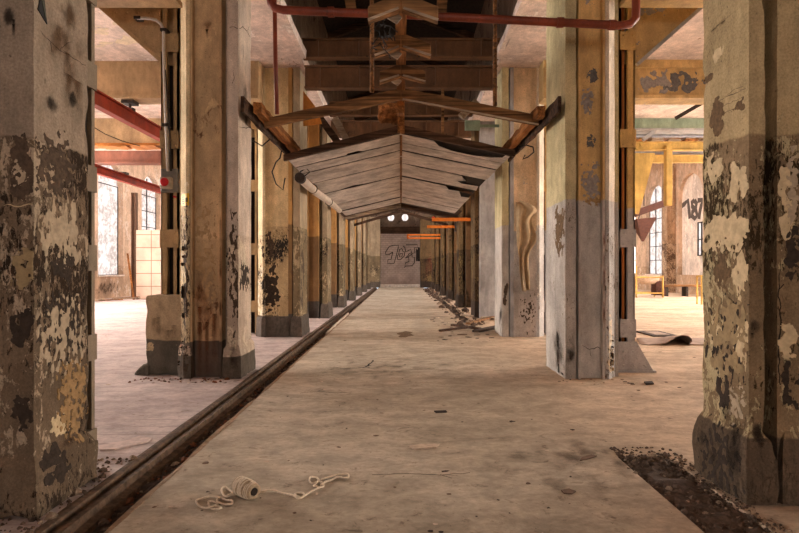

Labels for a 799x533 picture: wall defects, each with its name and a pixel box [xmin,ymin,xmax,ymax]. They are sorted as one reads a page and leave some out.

peeling [581,68,599,115]
peeling [640,45,724,94]
flaking render [709,96,745,137]
peeling [9,130,89,486]
peeling [228,210,251,338]
peeling [261,230,281,314]
peeling [519,293,535,335]
flaking render [554,205,565,257]
peeling [581,161,601,207]
peeling [697,151,750,502]
peeling [777,145,799,281]
peeling [777,323,799,410]